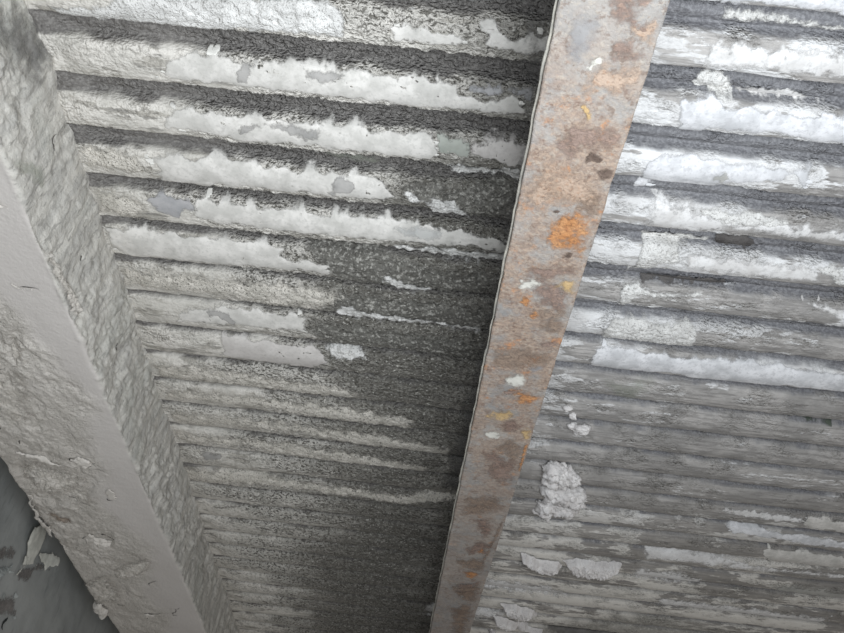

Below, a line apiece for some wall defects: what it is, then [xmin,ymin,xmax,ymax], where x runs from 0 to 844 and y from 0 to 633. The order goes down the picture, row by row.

peeling [721,0,844,16]
peeling [156,43,532,114]
rust [583,0,657,94]
peeling [165,101,526,167]
peeling [676,92,844,146]
peeling [105,148,507,274]
rust [523,165,599,253]
peeling [634,152,844,251]
peeling [591,337,844,392]
rust [486,411,529,471]
rust [452,497,502,633]
peeling [633,508,844,583]